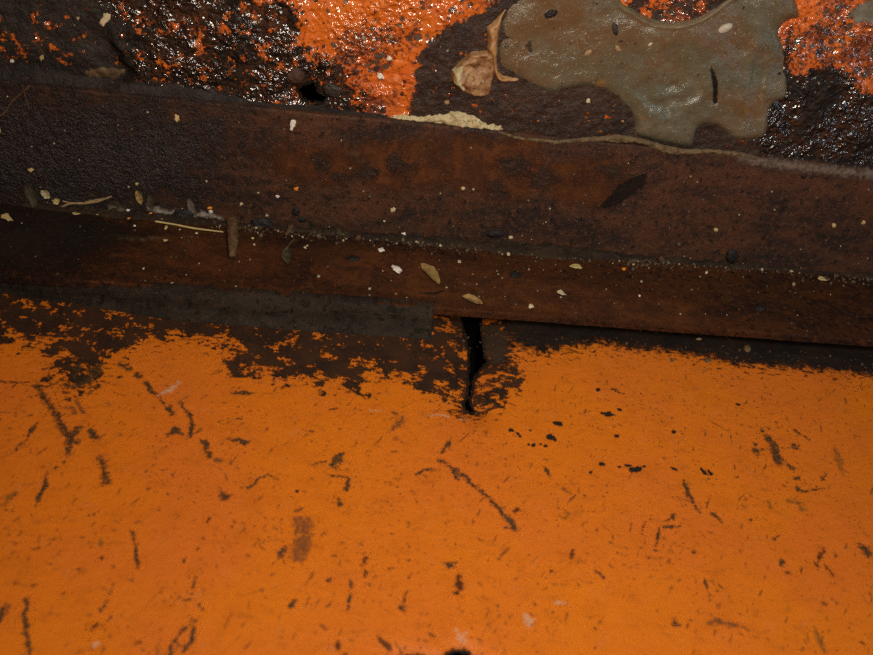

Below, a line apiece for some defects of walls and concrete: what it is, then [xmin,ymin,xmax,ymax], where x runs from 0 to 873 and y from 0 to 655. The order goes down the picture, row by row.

rust [0,0,388,119]
spalling [296,80,330,105]
peeling [450,50,494,96]
rust [407,0,873,166]
rust [0,244,873,429]
crack [445,647,471,655]